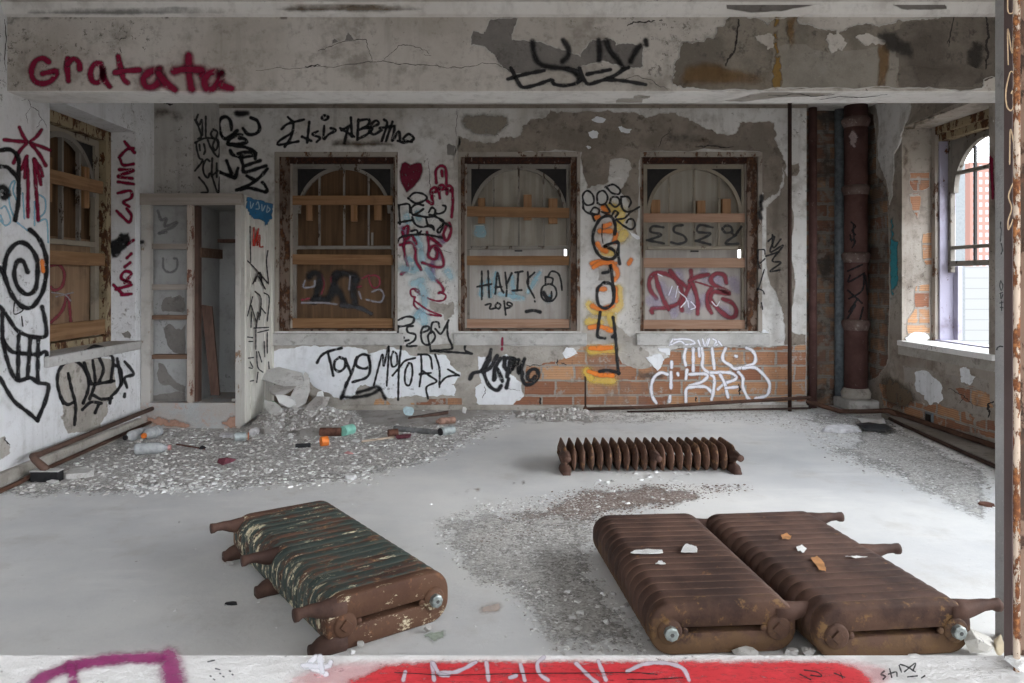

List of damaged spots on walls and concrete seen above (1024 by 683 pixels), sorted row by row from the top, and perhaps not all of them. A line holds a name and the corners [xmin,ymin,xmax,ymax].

crack [256,39,509,71]
peeling [470,17,644,74]
crack [725,19,740,66]
rust [772,17,795,88]
spalling [655,4,995,127]
flaking render [909,172,930,219]
flaking render [922,232,932,265]
flaking render [103,94,807,497]
flaking render [907,284,930,334]
peeling [59,358,117,434]
flaking render [902,366,995,439]